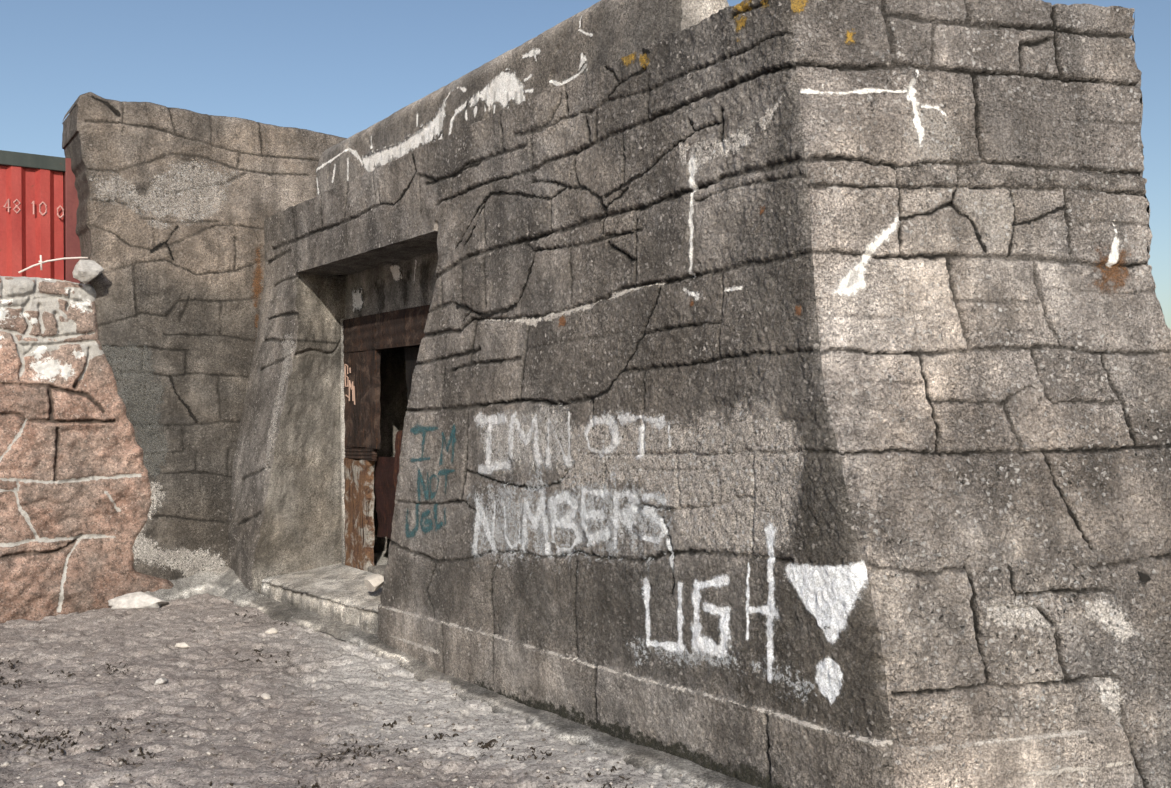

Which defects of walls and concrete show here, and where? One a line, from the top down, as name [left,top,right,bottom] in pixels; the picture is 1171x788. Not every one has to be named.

crack [607,67,646,97]
crack [92,96,121,117]
crack [379,153,417,206]
crack [150,225,179,261]
crack [898,187,1065,258]
crack [455,122,720,429]
corrosion [1096,248,1128,290]
crack [168,375,198,423]
crack [963,566,989,684]